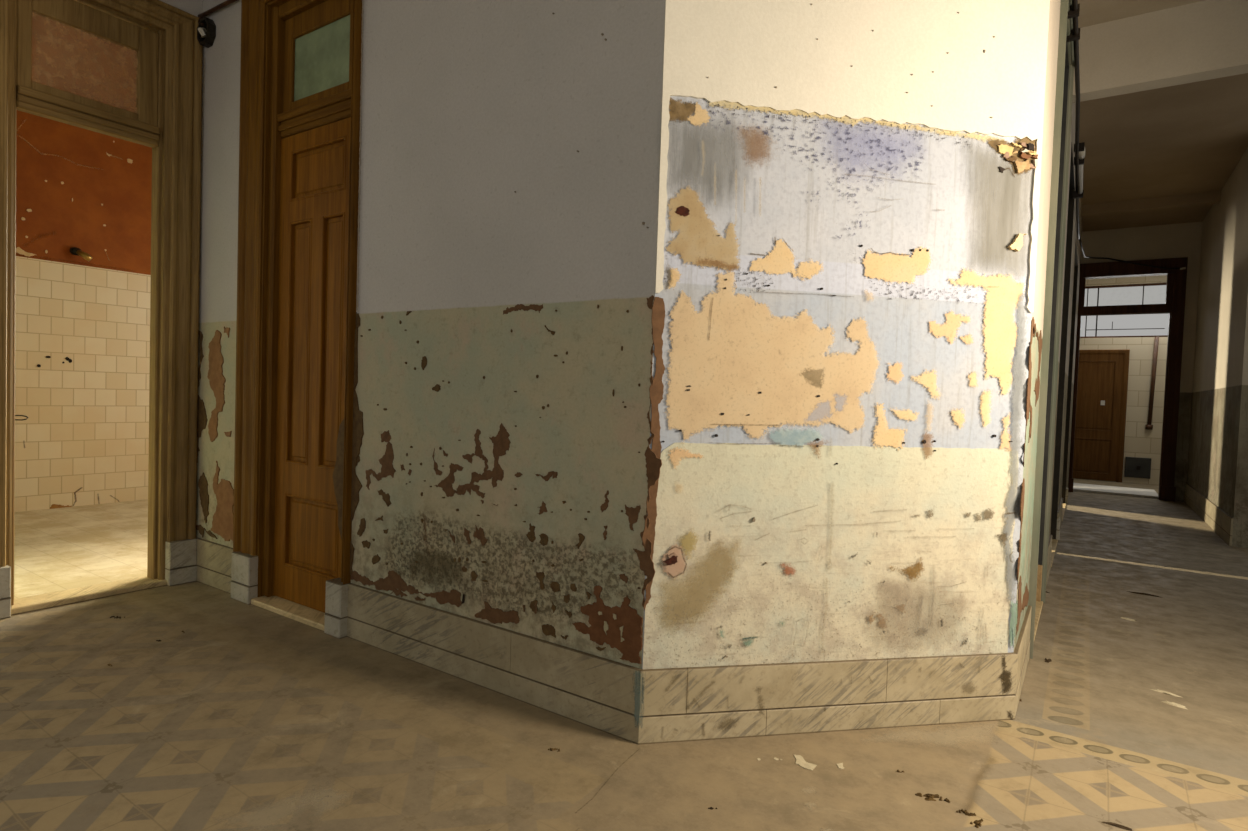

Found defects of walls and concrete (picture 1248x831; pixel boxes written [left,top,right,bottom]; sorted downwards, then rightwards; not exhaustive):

damp [673,102,1027,266]
spalling [669,97,1038,177]
peeling [1007,234,1026,252]
peeling [196,327,234,541]
peeling [333,311,558,607]
peeling [475,187,941,664]
peeling [929,268,1042,635]
damp [388,518,637,614]
damp [656,532,822,661]